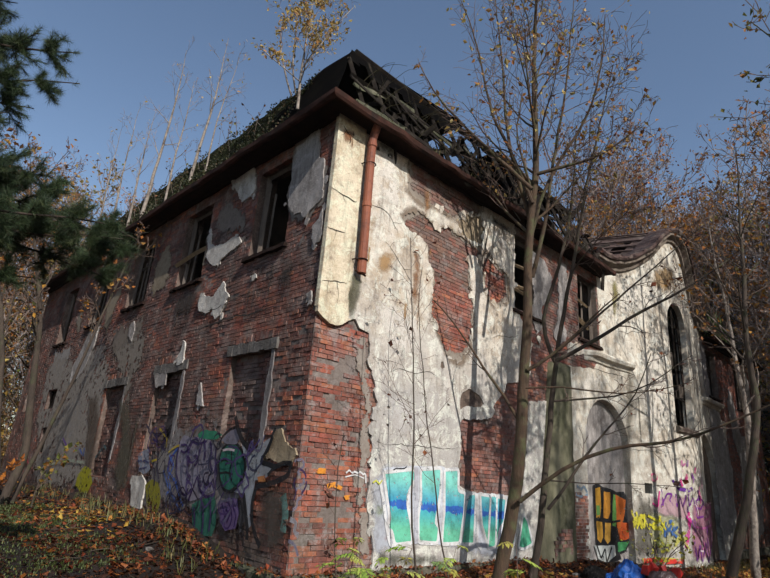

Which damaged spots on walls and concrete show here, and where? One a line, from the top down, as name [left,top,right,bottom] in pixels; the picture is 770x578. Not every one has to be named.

peeling [202,168,258,272]
peeling [284,128,329,250]
peeling [197,281,230,320]
flaking render [374,147,664,495]
flaking render [129,290,434,576]
flaking render [554,492,590,560]